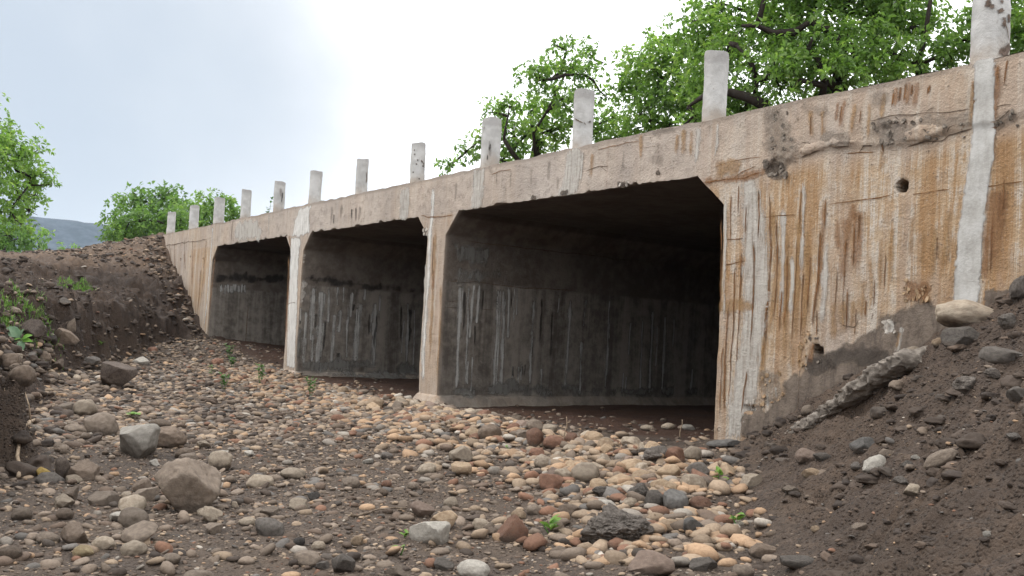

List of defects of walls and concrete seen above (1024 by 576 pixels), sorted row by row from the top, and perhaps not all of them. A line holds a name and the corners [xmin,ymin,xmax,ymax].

spalling [762,111,793,180]
corrosion [809,84,931,133]
spalling [871,118,966,145]
corrosion [992,60,1008,127]
damp [204,187,434,379]
damp [454,245,501,398]
damp [488,288,675,397]
corrosion [706,159,826,407]
damp [728,179,946,438]
corrosion [832,205,893,336]
corrosion [983,182,1007,275]